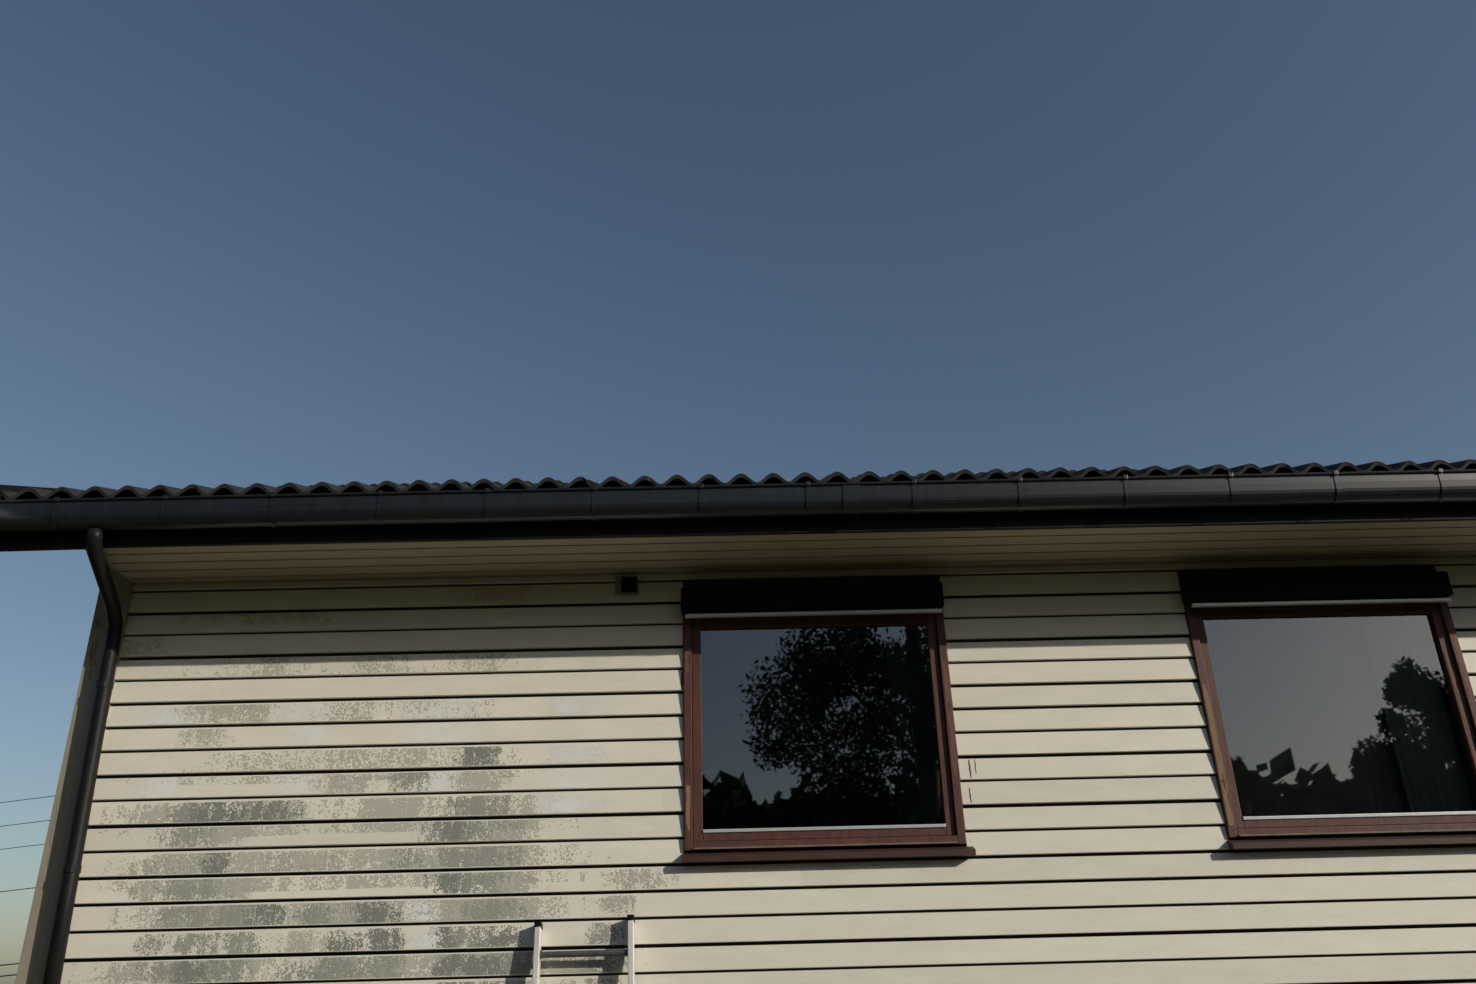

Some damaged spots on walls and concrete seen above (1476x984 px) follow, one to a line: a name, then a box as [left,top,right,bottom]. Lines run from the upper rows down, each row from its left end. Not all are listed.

water stain [102,700,680,984]
water stain [543,696,621,716]